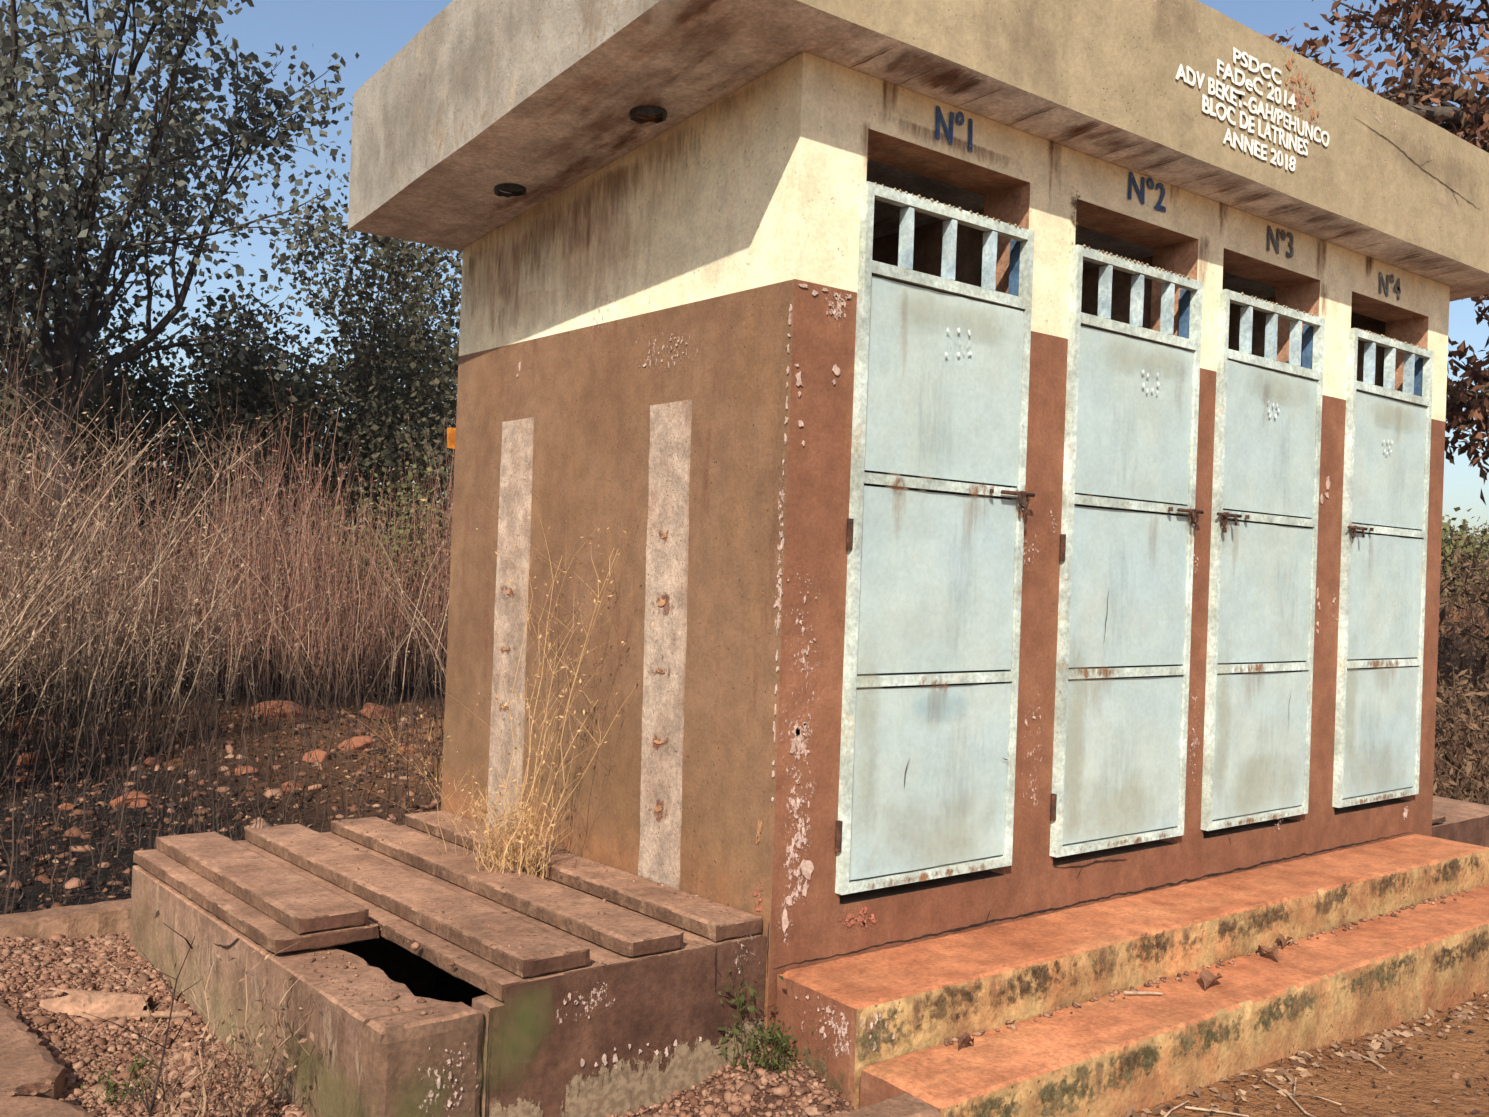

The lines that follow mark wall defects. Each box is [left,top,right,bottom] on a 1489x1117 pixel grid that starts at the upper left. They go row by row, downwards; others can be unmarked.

peeling [798,283,852,326]
rust [652,592,672,614]
peeling [744,304,821,943]
rust [654,800,667,822]
leakage [1095,903,1291,978]
leakage [1435,930,1489,972]
leakage [1343,954,1416,995]
peeling [557,983,615,1023]
leakage [856,961,1072,1060]
leakage [1039,991,1316,1117]
peeling [419,1042,479,1117]
leakage [948,1094,1021,1117]